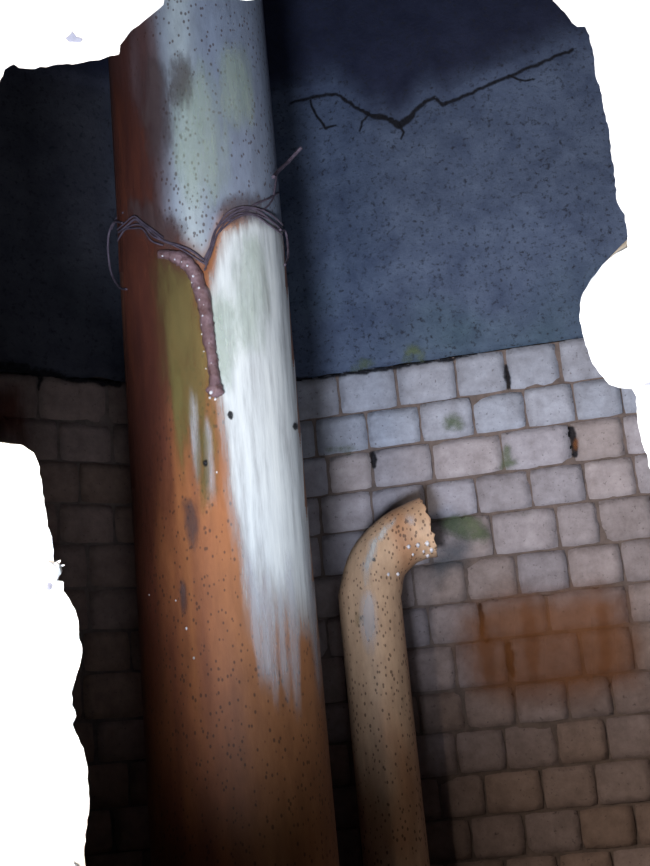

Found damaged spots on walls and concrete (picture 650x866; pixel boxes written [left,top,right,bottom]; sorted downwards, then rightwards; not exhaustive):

peeling [43,561,62,582]
corrosion [114,63,190,483]
damp [212,220,316,623]
crack [290,48,573,139]